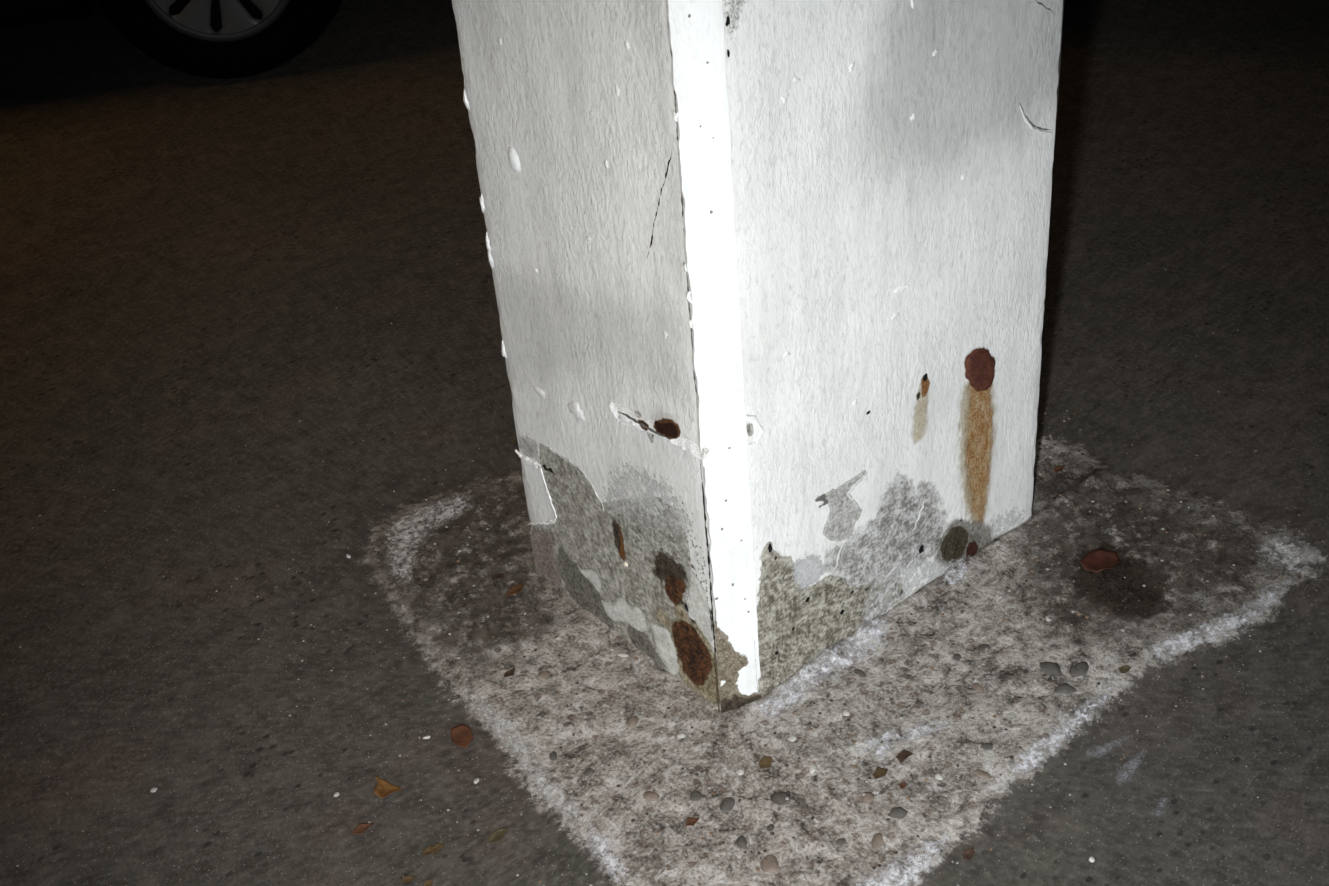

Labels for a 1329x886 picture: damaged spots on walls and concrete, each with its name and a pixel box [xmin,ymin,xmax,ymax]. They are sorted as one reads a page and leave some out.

rust [914,373,930,442]
rust [936,347,996,566]
leakage [385,494,471,582]
peeling [528,443,713,684]
rust [653,552,719,703]
leakage [714,559,967,718]
peeling [754,470,945,698]
leakage [1072,545,1169,618]
leakage [1153,536,1319,657]
leakage [461,688,629,883]
leakage [1014,687,1114,773]
leakage [856,837,947,886]